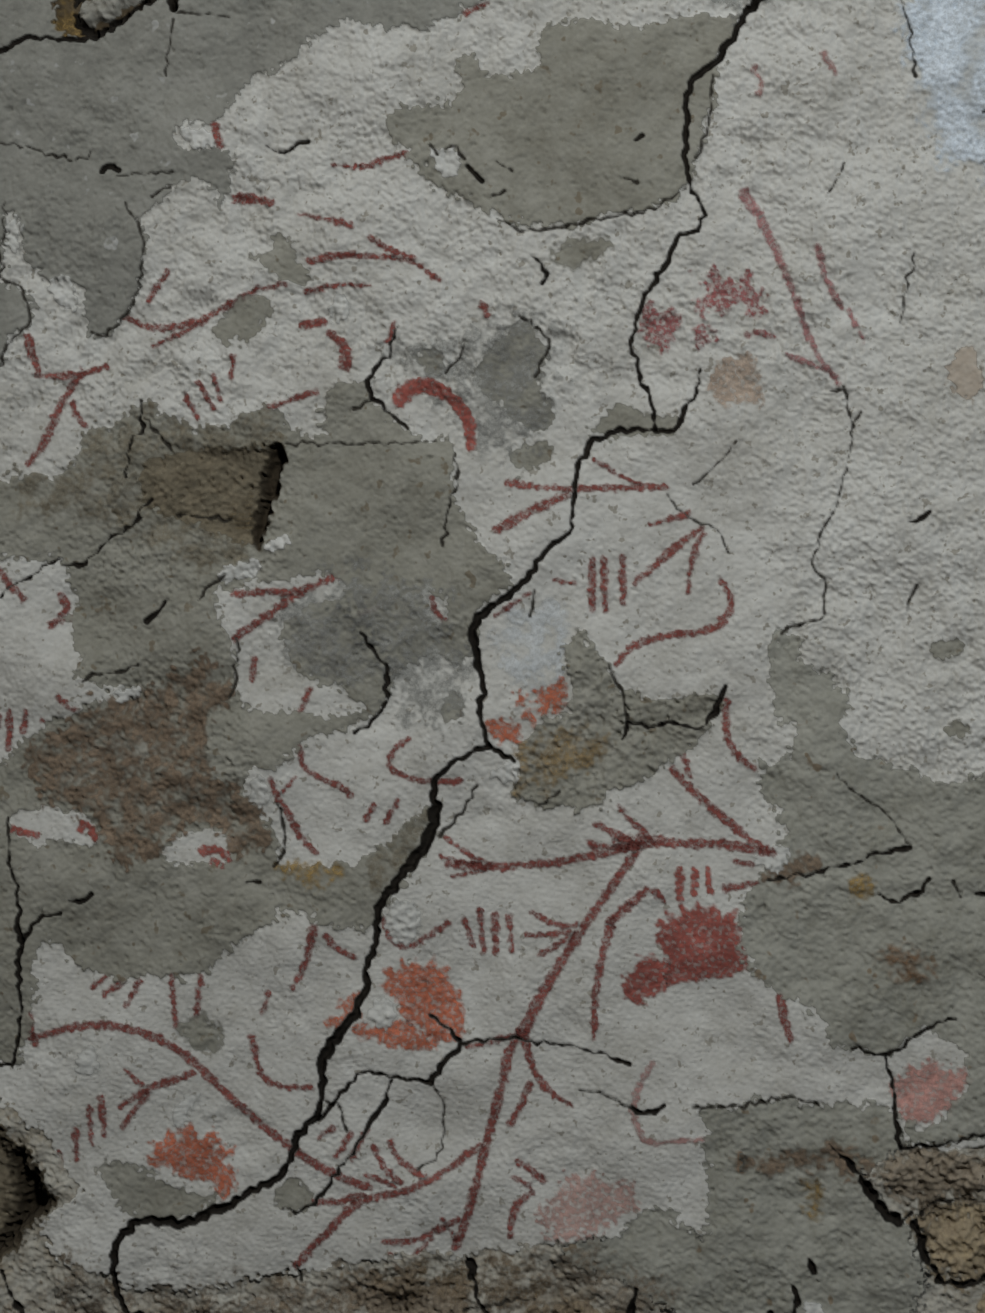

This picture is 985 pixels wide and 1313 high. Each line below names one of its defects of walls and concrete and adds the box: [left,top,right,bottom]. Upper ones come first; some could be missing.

crack [0,0,229,77]
crack [0,143,173,337]
flaking render [0,0,482,363]
flaking render [386,12,740,270]
peeling [412,347,445,379]
flaking render [0,377,514,1069]
crack [109,0,763,1313]
crack [768,773,912,881]
flaking render [0,626,985,1313]
crack [579,1090,820,1115]
crack [851,1017,985,1150]
crack [832,1147,985,1288]